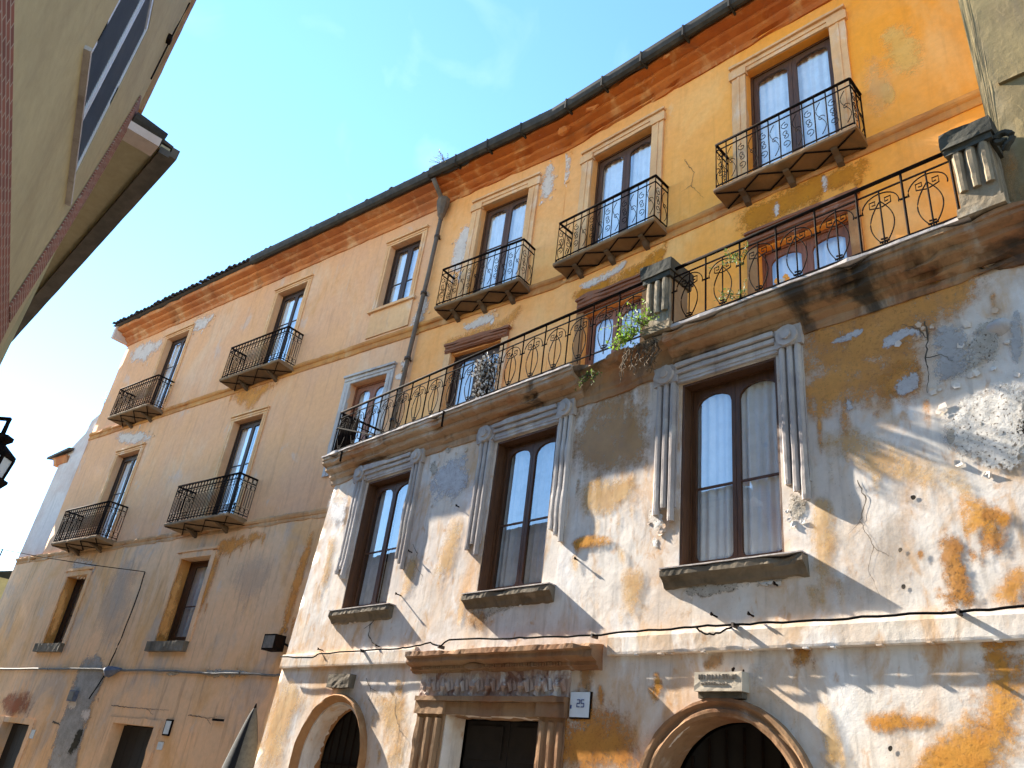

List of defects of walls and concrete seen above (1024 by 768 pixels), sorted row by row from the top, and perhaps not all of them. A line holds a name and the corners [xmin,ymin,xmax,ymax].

peeling [539,151,573,206]
peeling [128,336,164,366]
peeling [192,315,216,335]
peeling [831,329,863,343]
damp [804,267,983,484]
crack [903,321,953,393]
spalling [883,307,1024,479]
peeling [118,427,154,444]
crack [848,480,886,595]